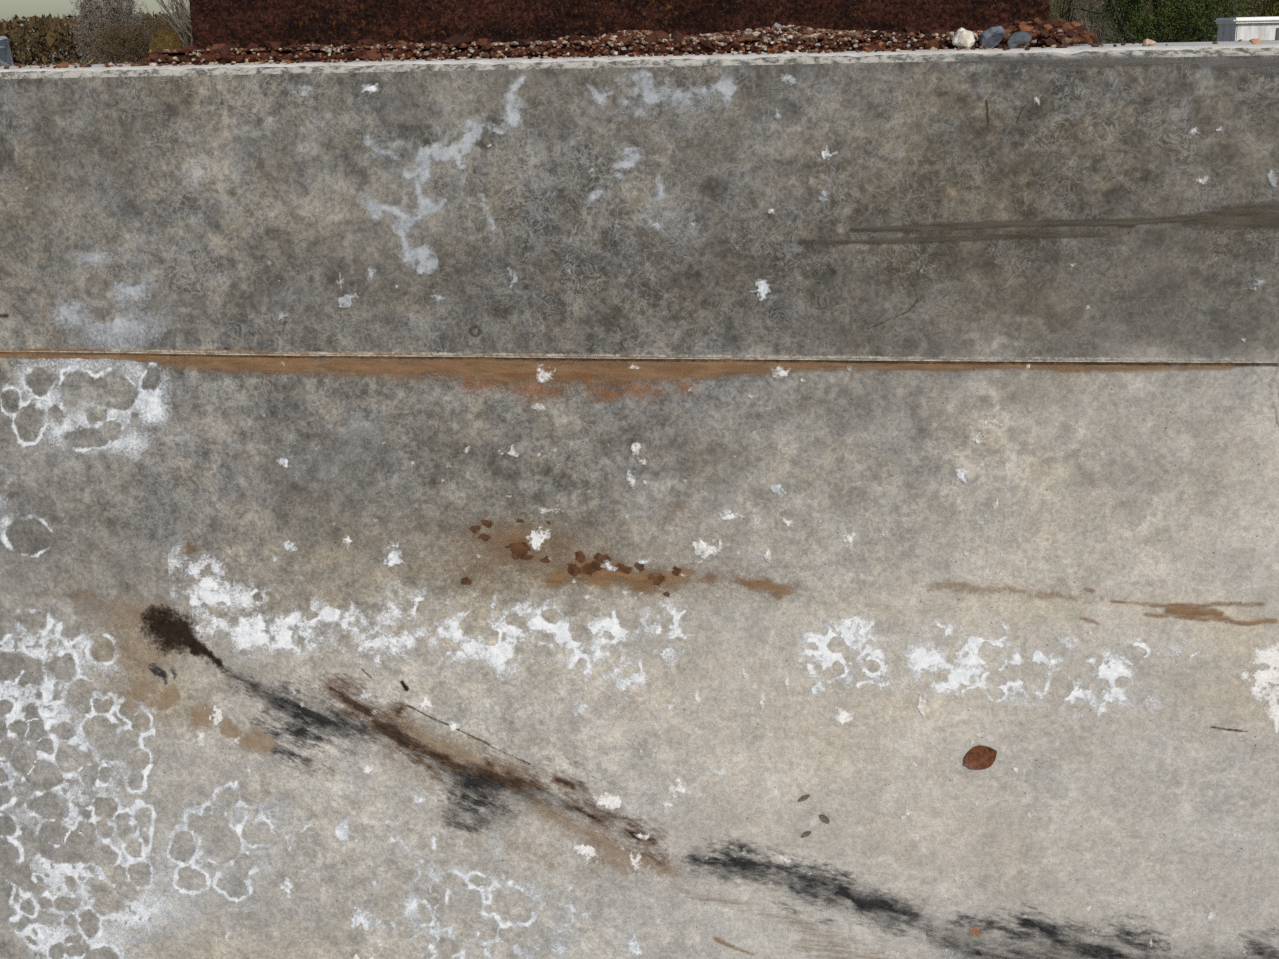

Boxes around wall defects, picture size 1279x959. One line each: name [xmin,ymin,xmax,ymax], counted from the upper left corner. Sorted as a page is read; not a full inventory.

damp [591,71,736,116]
damp [361,76,525,274]
damp [1,281,168,458]
corrosion [0,349,1251,391]
damp [168,546,693,691]
corrosion [544,560,692,593]
corrosion [738,578,790,598]
damp [798,616,905,694]
damp [905,619,1200,717]
corrosion [1145,603,1277,625]
damp [0,609,311,959]
damp [375,837,595,959]